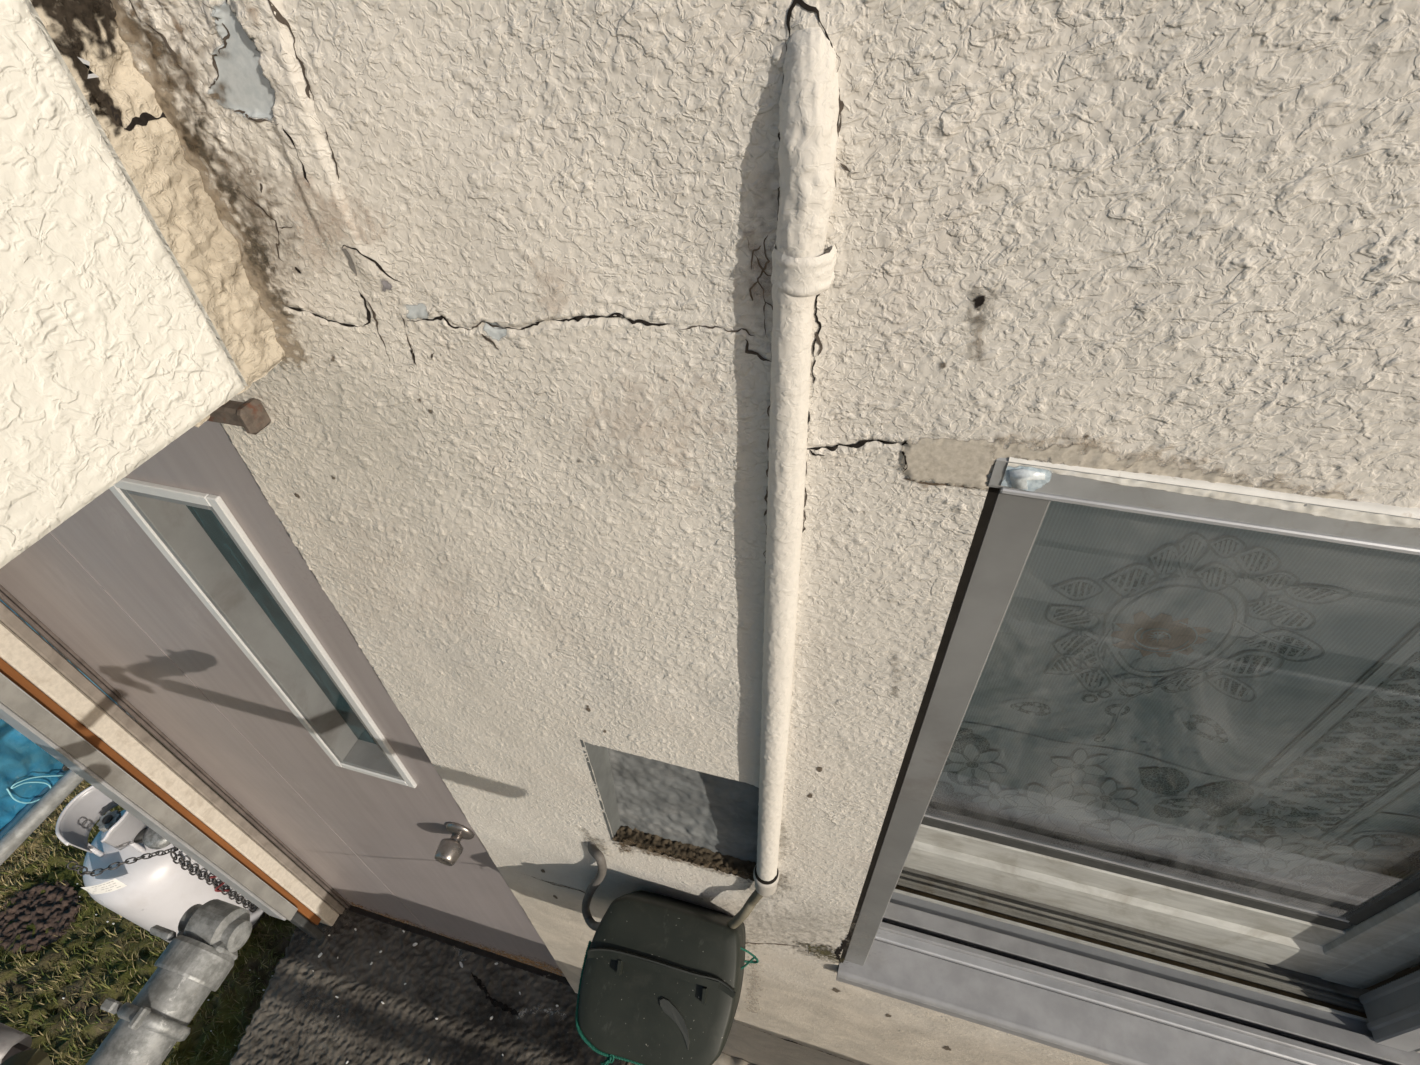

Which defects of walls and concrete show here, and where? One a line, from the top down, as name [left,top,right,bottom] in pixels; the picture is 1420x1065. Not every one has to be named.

crack [107,100,166,131]
damp [31,0,307,368]
crack [129,0,339,185]
peeling [208,2,275,120]
crack [242,183,301,274]
crack [285,187,780,364]
crack [783,0,859,218]
crack [763,401,771,564]
crack [799,294,988,575]